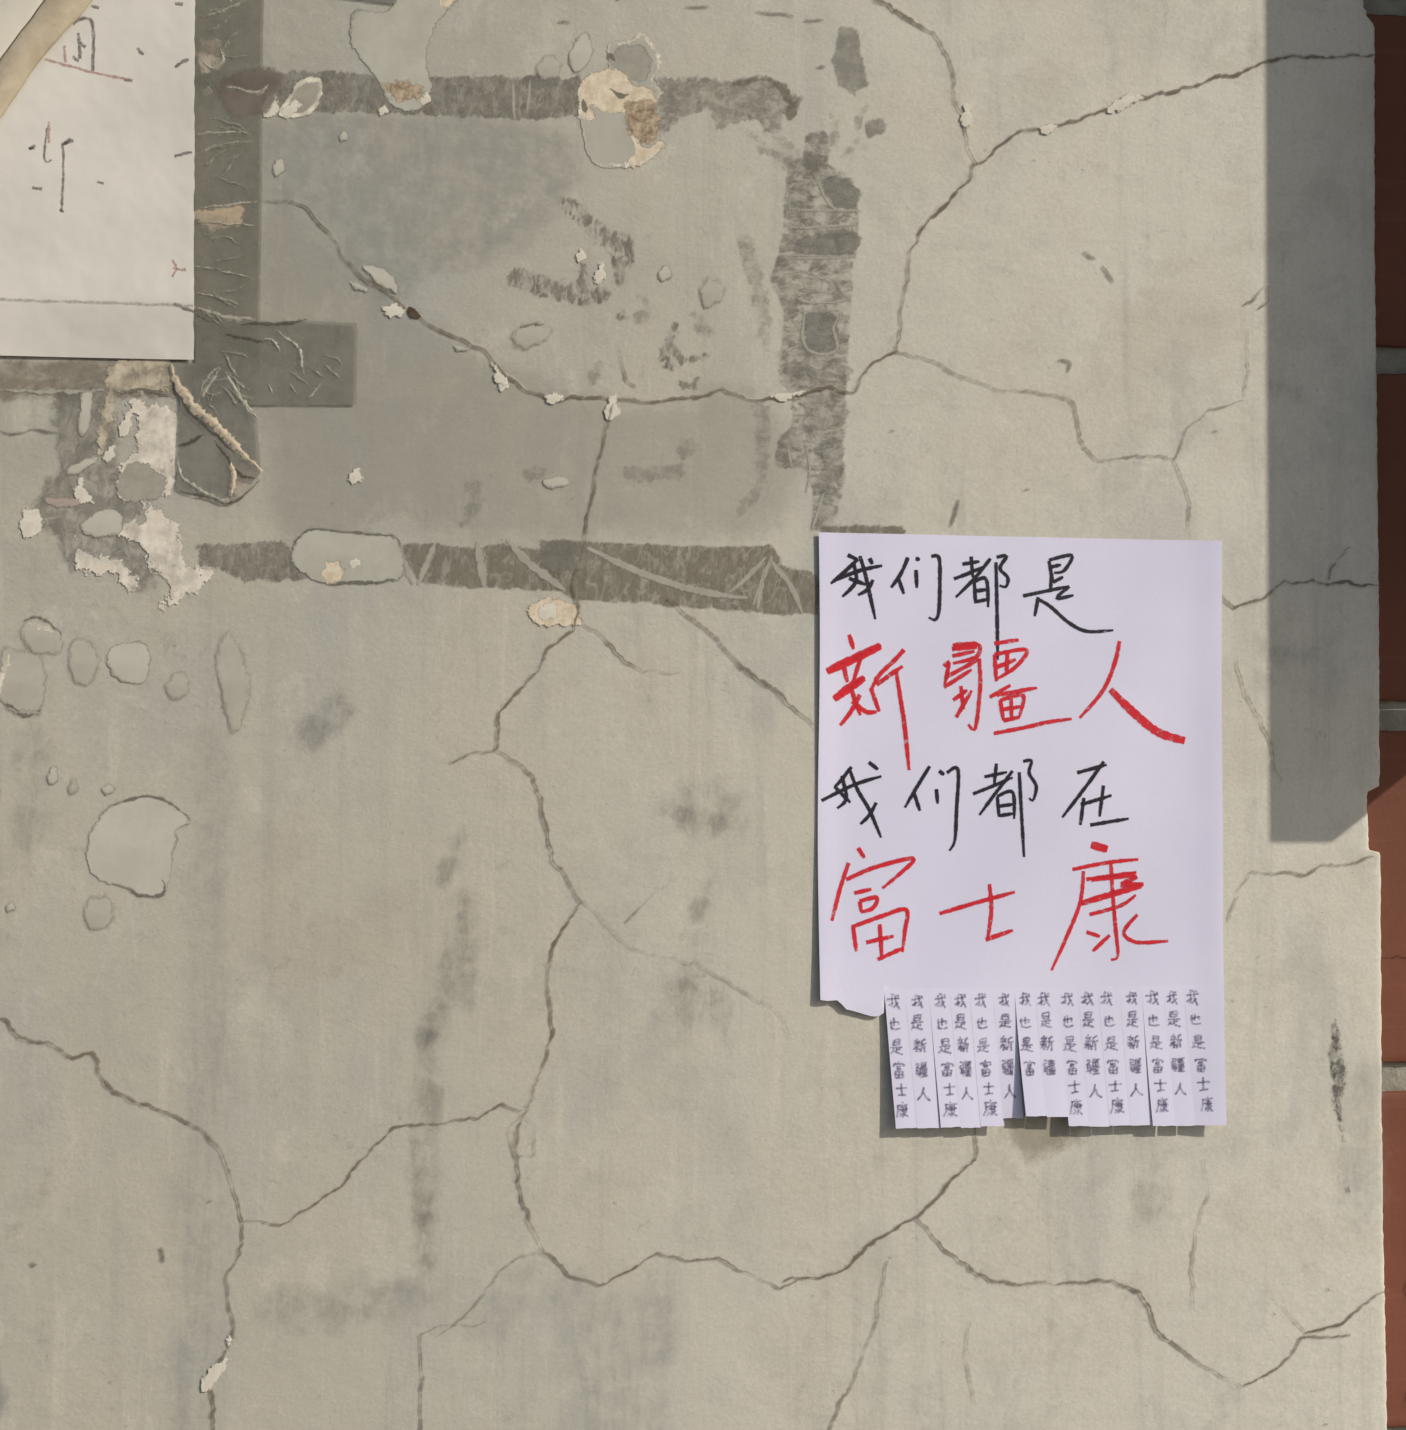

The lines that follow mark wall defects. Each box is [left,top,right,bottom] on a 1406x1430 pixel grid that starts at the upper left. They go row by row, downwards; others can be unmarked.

peeling [263,76,322,119]
peeling [349,0,458,116]
spalling [537,32,666,169]
crack [290,201,336,241]
peeling [350,265,408,318]
peeling [6,358,214,612]
peeling [290,527,404,585]
crack [358,0,1381,1064]
peeling [0,616,64,718]
peeling [86,783,191,898]
crack [0,1017,1021,1430]
crack [1059,1278,1387,1386]